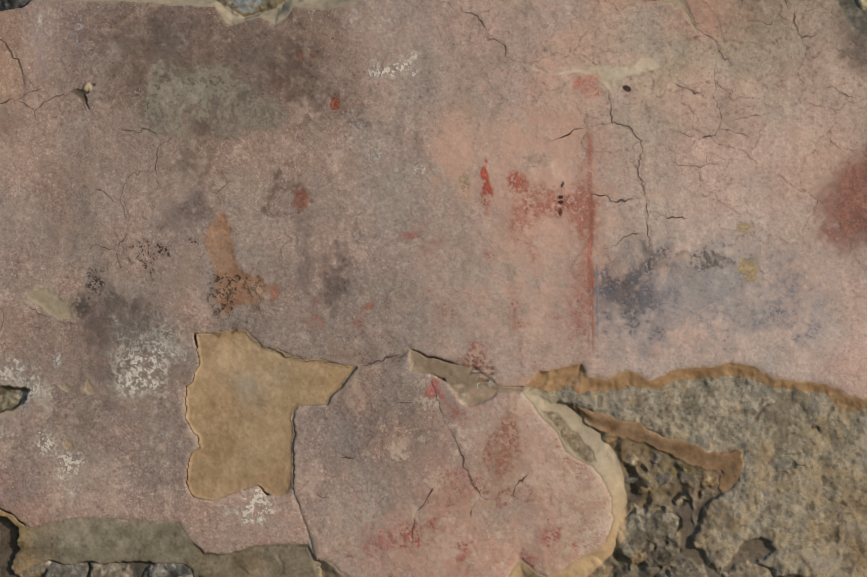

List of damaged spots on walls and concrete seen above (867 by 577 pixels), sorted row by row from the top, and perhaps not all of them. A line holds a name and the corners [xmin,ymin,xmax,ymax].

spalling [545,376,867,577]